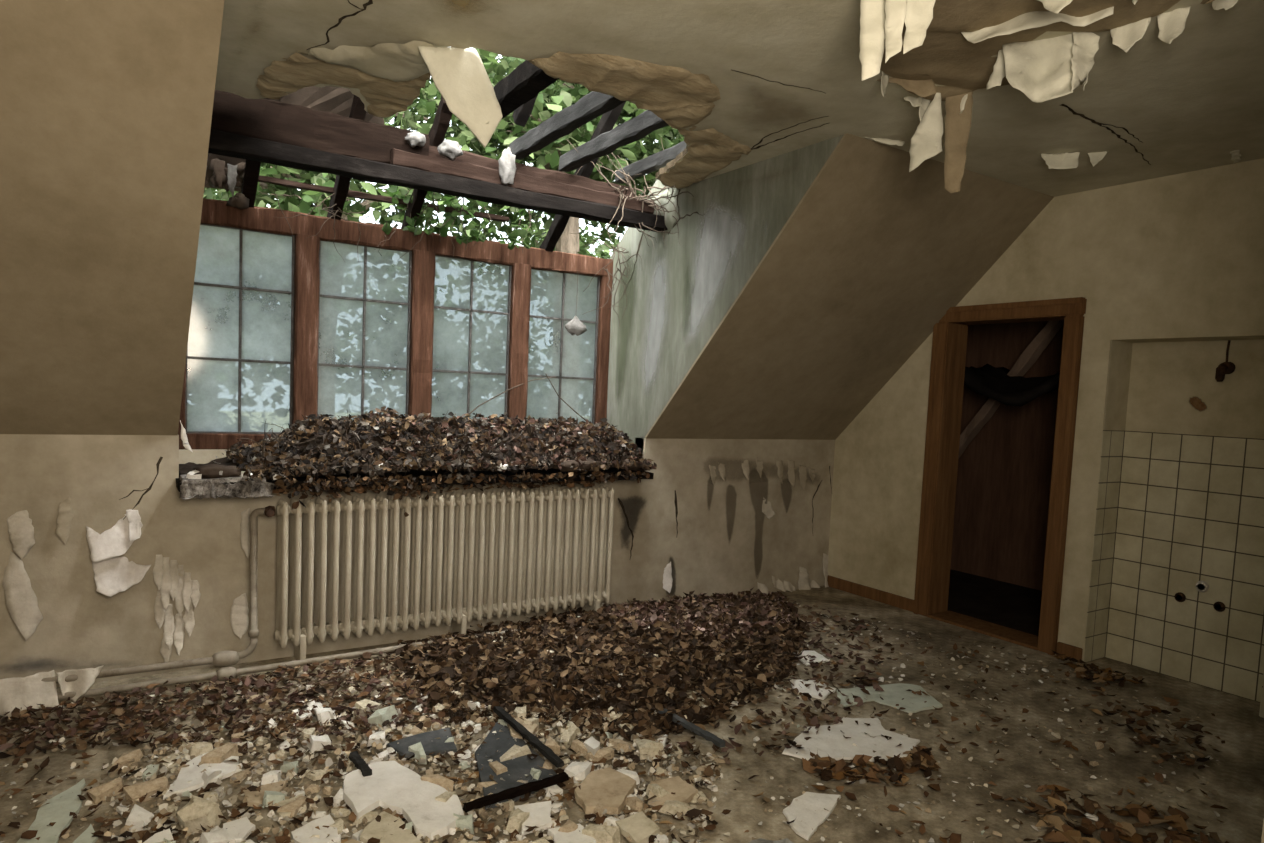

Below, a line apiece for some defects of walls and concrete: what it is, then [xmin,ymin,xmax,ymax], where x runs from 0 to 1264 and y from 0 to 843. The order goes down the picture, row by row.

crack [307,0,373,50]
spalling [256,41,446,118]
spalling [529,51,752,189]
crack [1060,104,1151,165]
crack [119,457,163,520]
water stain [708,469,792,575]
peeling [2,510,43,641]
peeling [86,509,201,662]